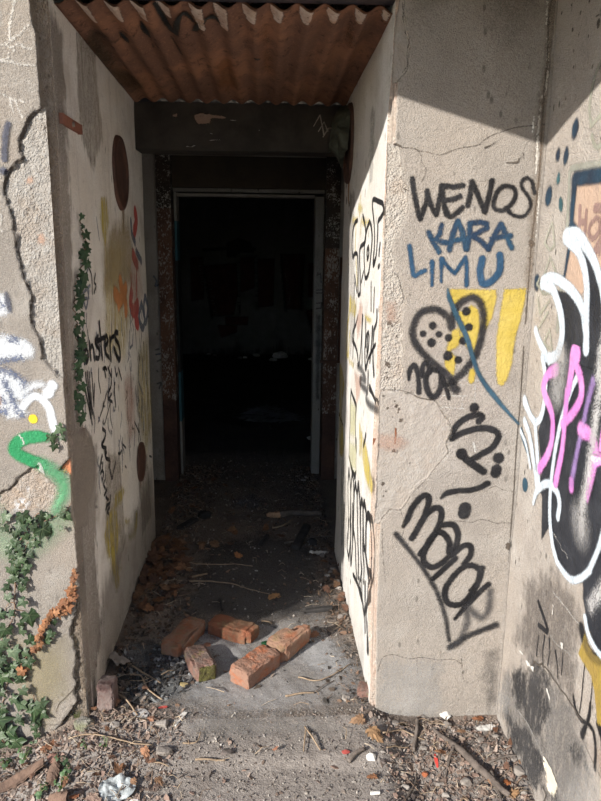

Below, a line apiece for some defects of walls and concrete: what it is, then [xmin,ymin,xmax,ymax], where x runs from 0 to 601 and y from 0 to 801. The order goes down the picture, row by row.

crack [403,124,545,181]
flaking render [0,428,95,530]